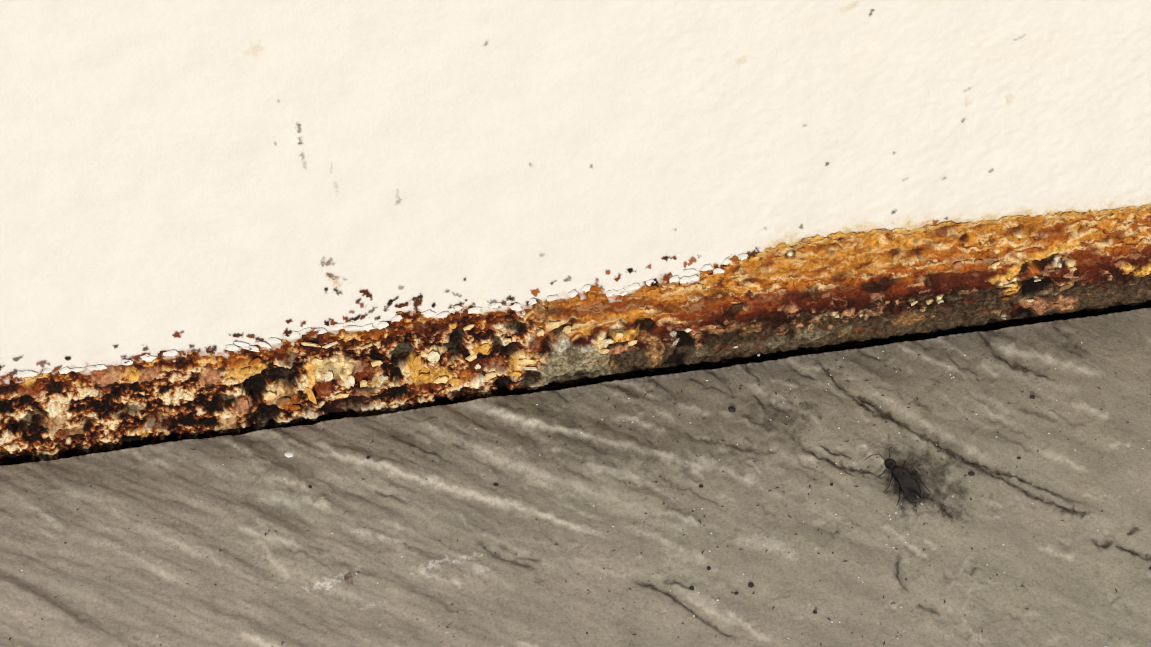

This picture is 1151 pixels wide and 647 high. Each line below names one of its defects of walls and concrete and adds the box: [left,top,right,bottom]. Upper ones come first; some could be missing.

corrosion [543,205,1151,366]
corrosion [536,375,610,392]